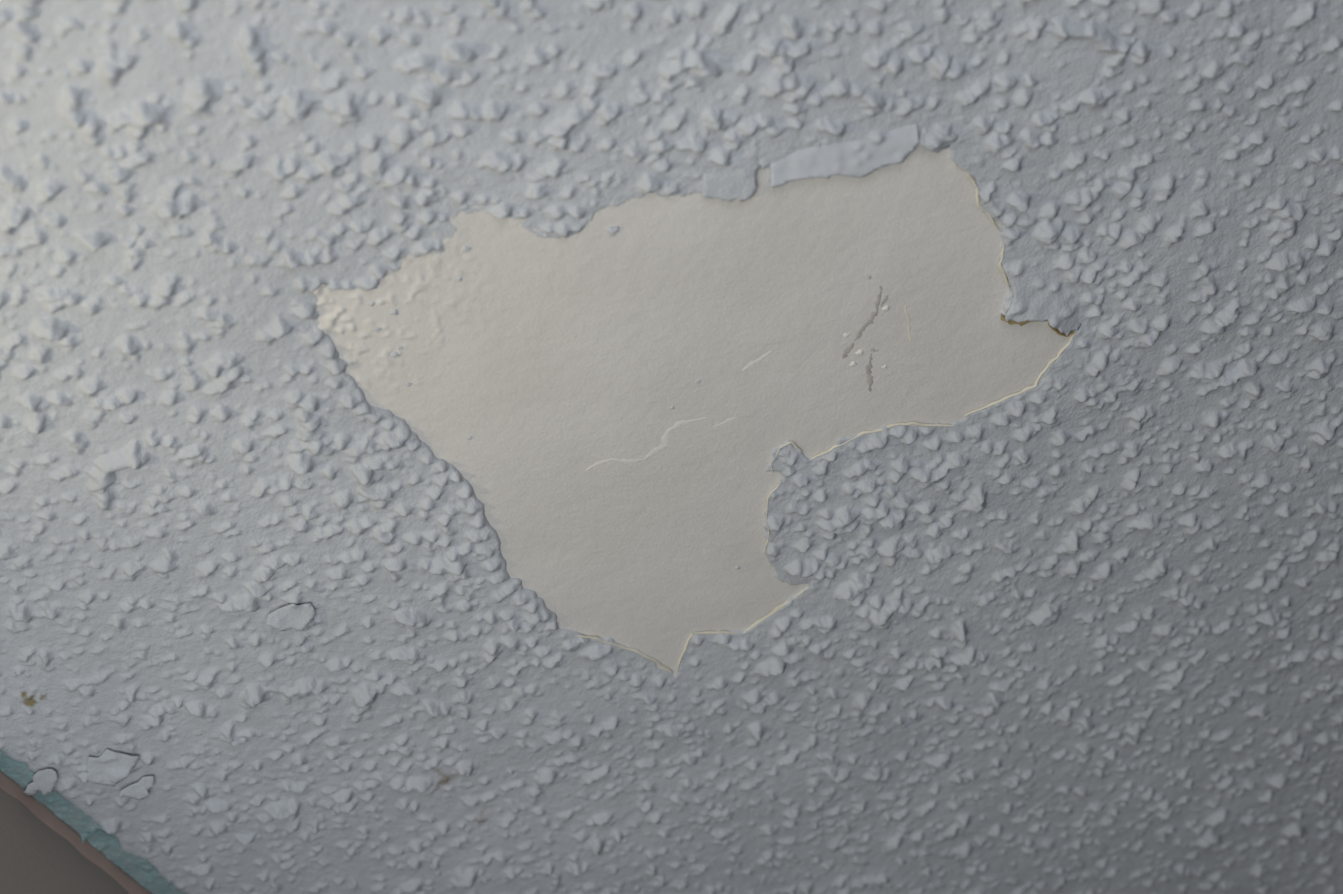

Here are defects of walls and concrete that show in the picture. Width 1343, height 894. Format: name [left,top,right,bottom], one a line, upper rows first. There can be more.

peeling [266,603,315,631]
peeling [314,124,1081,674]